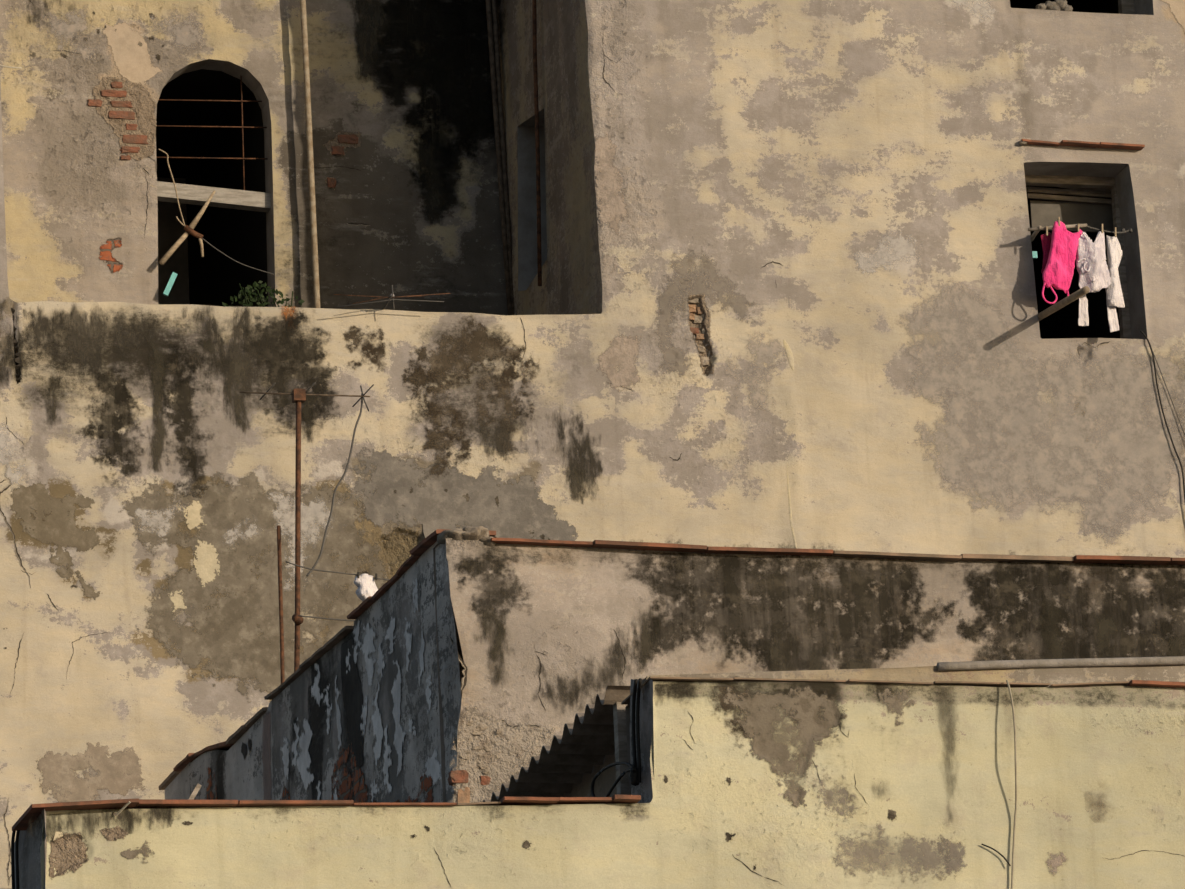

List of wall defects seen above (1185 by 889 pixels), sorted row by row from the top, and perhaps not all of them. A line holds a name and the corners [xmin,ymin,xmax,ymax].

flaking render [88,22,162,161]
crack [11,307,22,383]
water stain [0,305,339,497]
water stain [344,326,385,370]
water stain [403,316,539,475]
peeling [655,254,785,409]
crack [0,417,58,610]
peeling [10,481,103,600]
peeling [120,447,578,803]
water stain [454,549,528,684]
water stain [539,541,1185,706]
peeling [36,742,145,803]